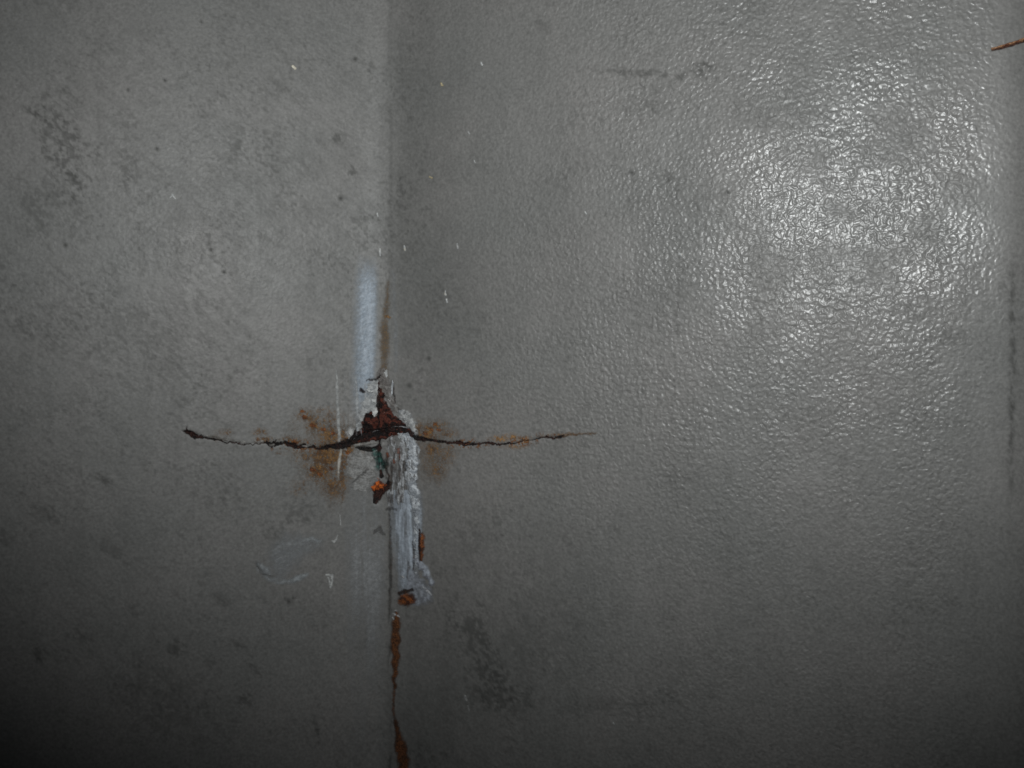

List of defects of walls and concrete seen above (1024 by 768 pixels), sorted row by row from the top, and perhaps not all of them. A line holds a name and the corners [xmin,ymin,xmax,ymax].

crack [184,381,382,453]
corrosion [285,410,359,493]
peeling [327,368,425,493]
crack [405,426,565,446]
corrosion [371,423,529,768]